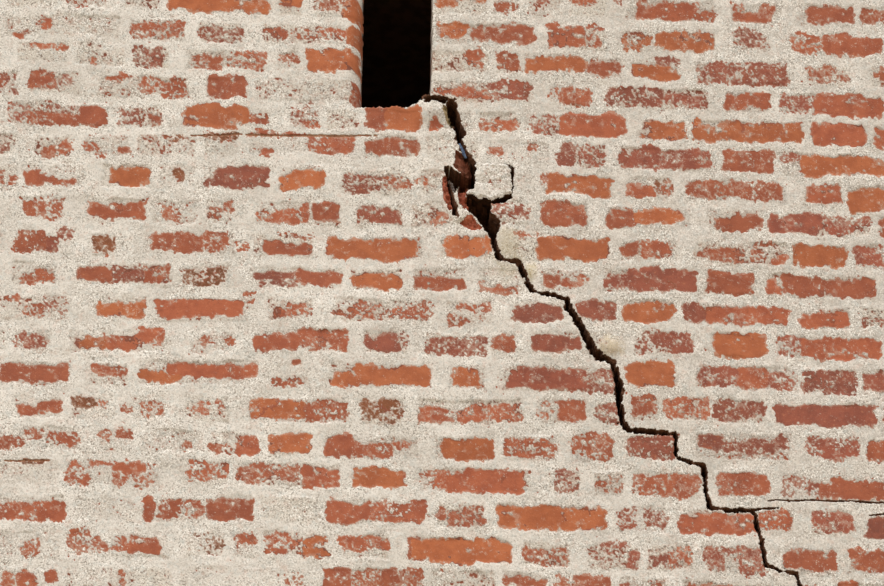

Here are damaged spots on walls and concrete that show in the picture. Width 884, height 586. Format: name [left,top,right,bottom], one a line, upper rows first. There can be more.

crack [190,131,377,139]
crack [422,94,884,586]